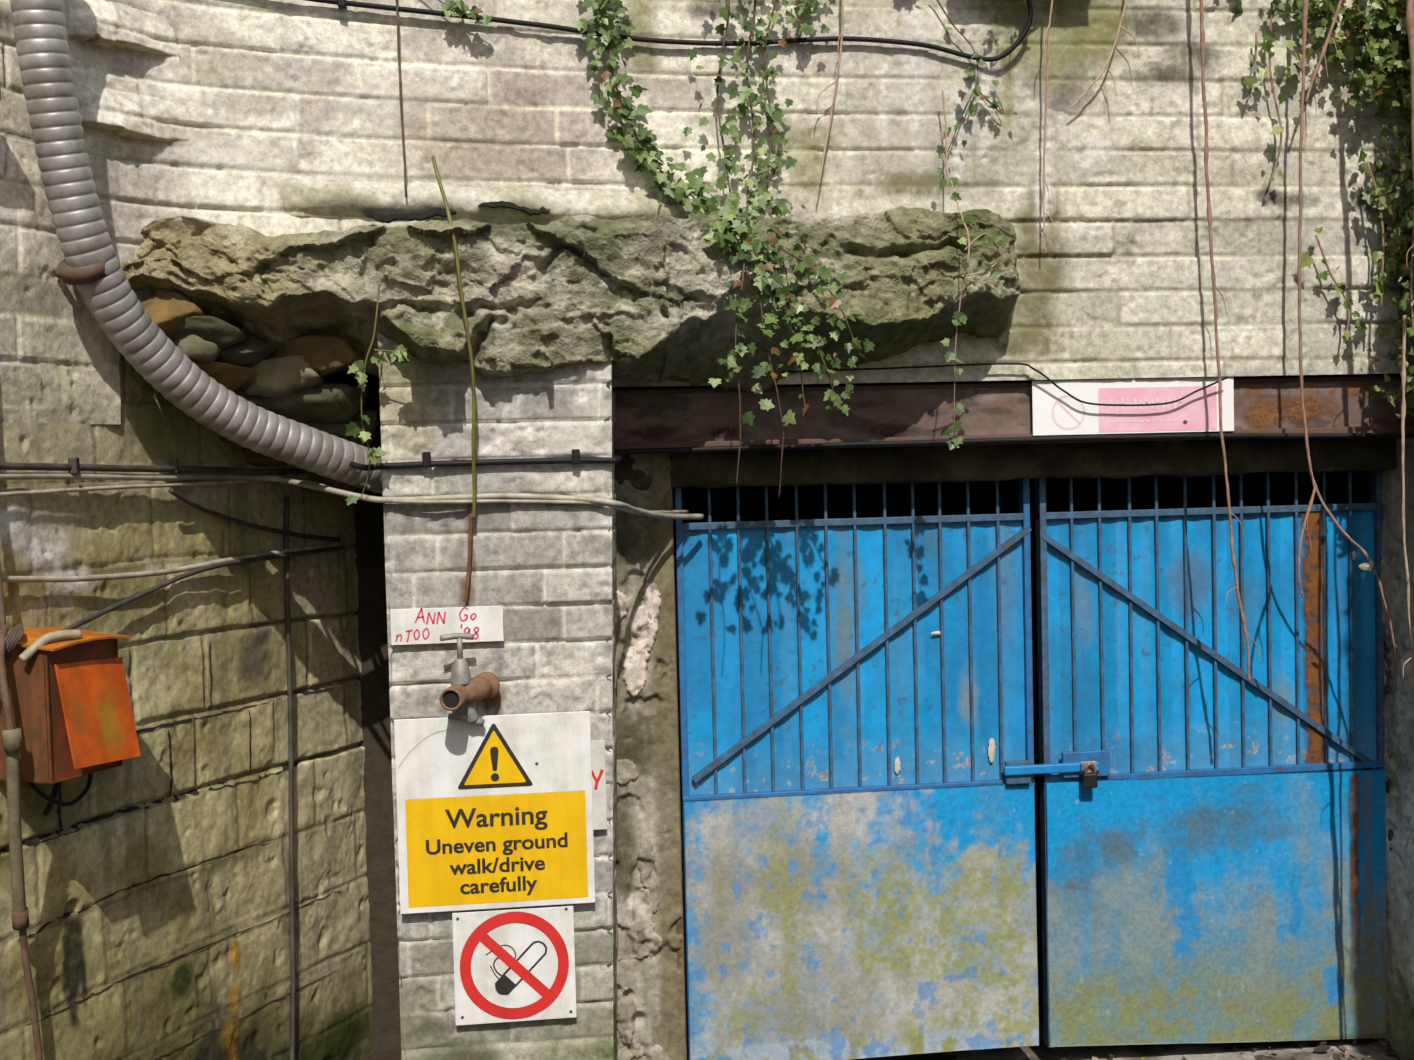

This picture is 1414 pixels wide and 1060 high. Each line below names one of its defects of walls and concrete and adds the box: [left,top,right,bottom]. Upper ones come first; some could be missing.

corrosion [1245,398,1330,428]
peeling [615,583,661,698]
peeling [616,759,639,785]
peeling [617,834,663,960]
water stain [63,916,86,1026]
water stain [195,1004,362,1060]
water stain [443,1046,494,1060]
peeling [617,987,671,1060]